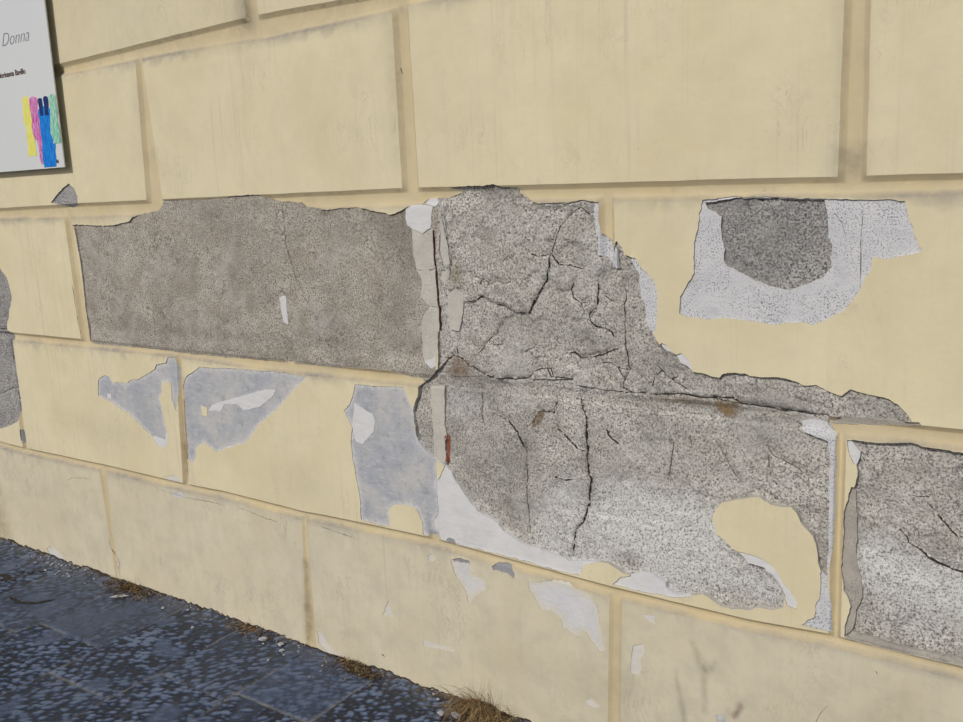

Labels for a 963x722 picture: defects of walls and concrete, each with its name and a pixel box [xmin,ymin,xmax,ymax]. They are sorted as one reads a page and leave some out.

flaking render [0,269,26,443]
flaking render [74,195,963,664]
crack [421,207,824,553]
crack [899,529,963,573]
crack [914,495,958,537]